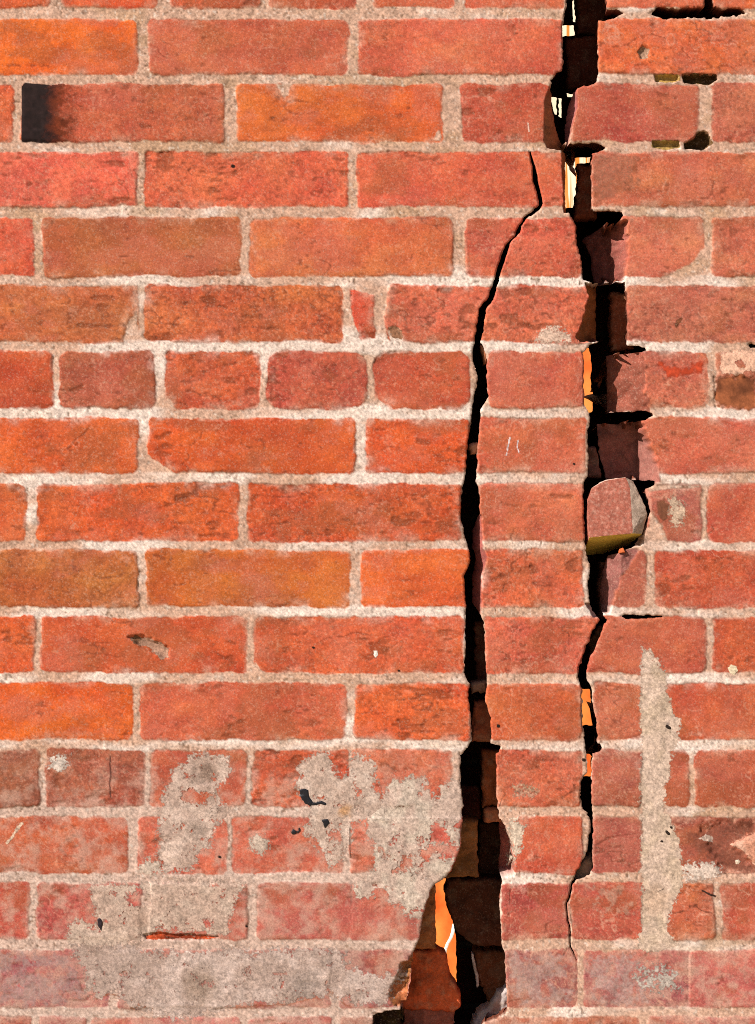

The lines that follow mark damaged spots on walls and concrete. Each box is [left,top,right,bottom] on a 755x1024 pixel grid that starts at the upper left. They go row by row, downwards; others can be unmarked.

crack [402,0,655,1024]
spalling [145,931,216,940]
spalling [391,955,412,1005]